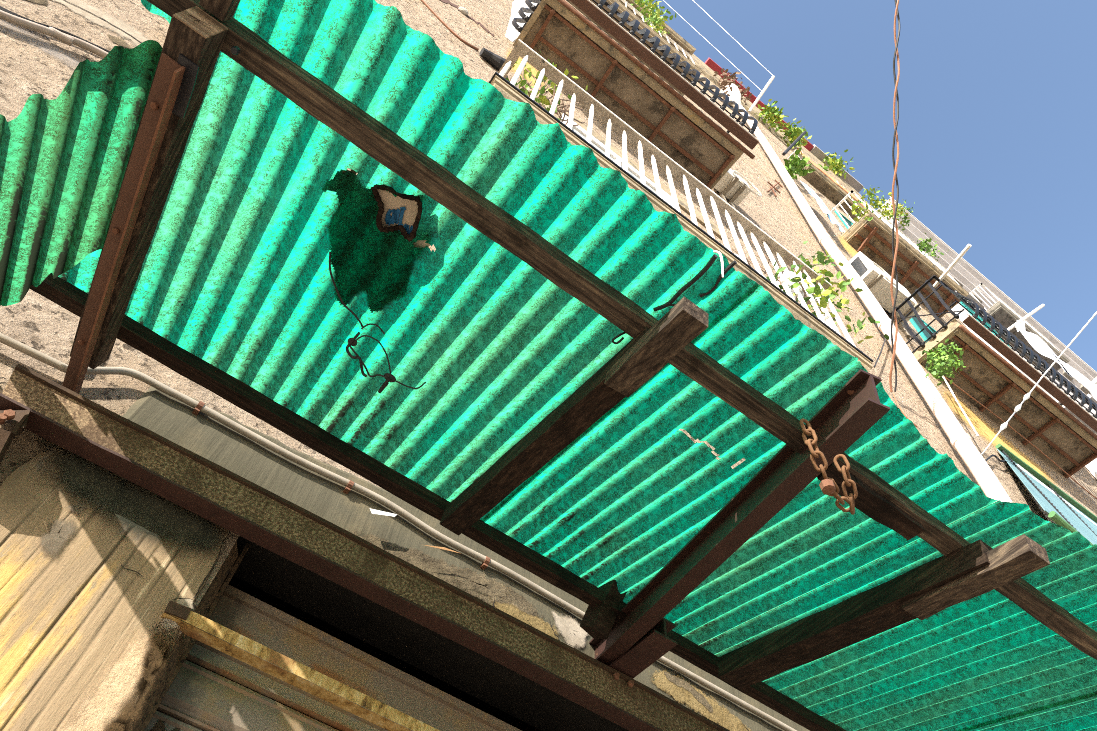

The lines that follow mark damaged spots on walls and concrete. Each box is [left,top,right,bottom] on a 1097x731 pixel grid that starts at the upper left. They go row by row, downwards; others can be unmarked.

leakage [50,450,226,552]
spalling [352,529,588,648]
spalling [652,668,751,731]